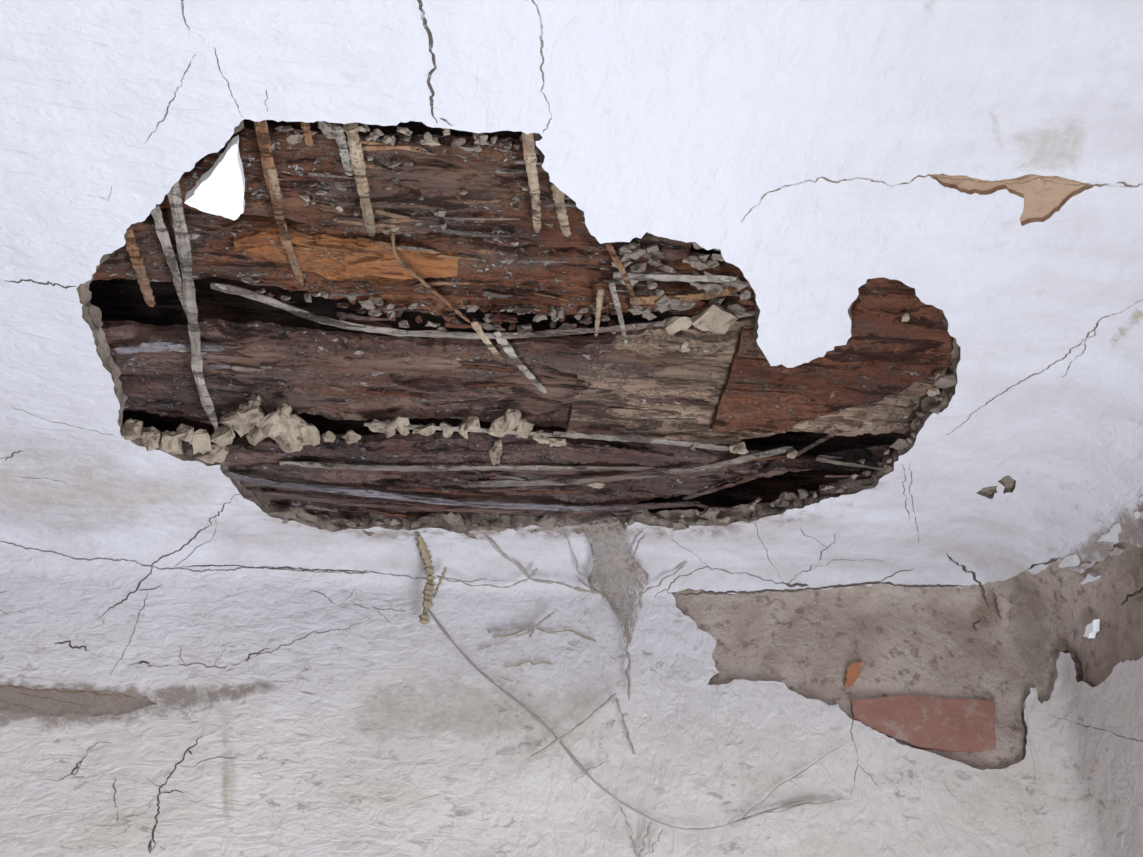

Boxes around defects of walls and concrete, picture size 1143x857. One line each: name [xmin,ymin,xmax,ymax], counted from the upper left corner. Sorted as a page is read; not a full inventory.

crack [417,0,450,124]
crack [526,0,552,132]
flaking render [184,120,245,220]
spalling [534,133,550,181]
crack [741,175,1140,222]
spalling [929,173,1094,226]
spalling [76,254,541,533]
spalling [558,309,961,528]
damp [0,682,271,726]
crack [0,494,502,710]
crack [655,521,1002,631]
spalling [672,523,1143,784]